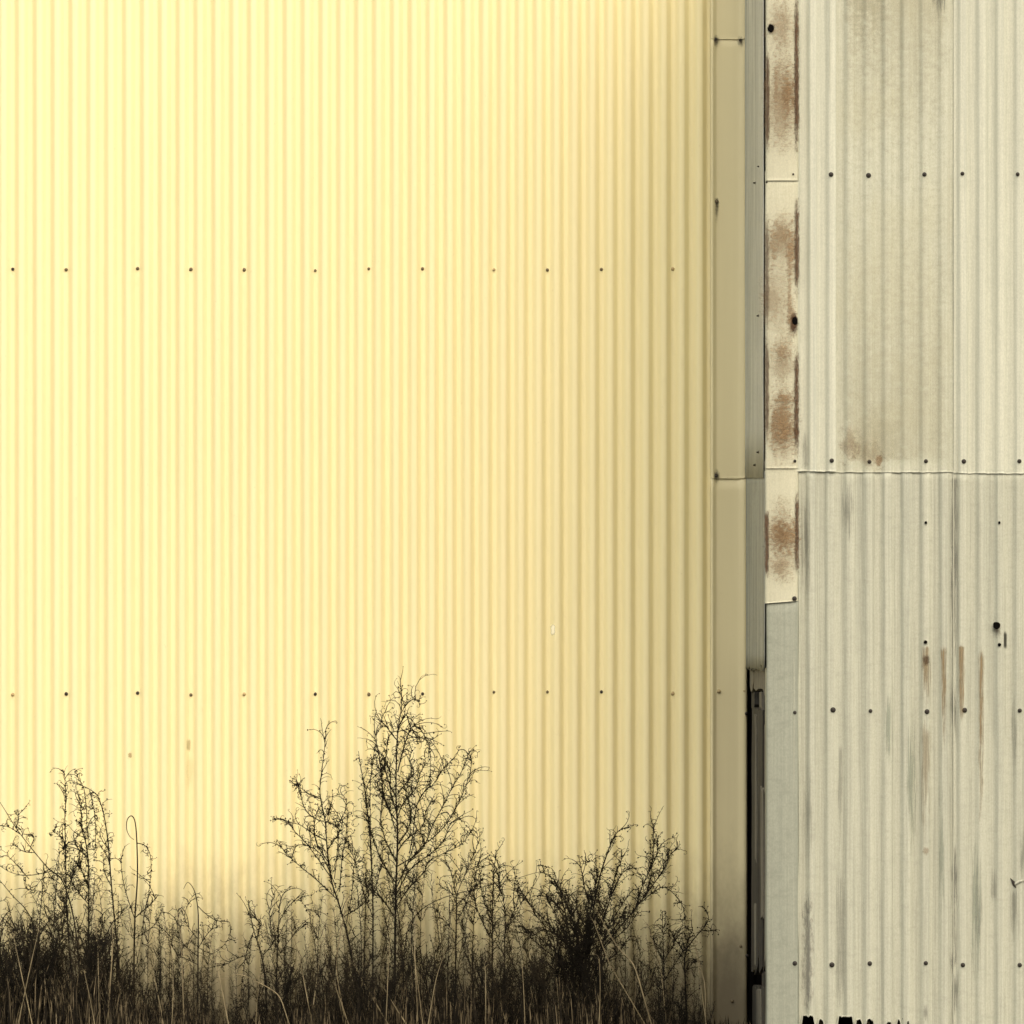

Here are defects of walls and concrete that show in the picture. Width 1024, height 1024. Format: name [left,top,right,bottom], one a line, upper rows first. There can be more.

rust [765,2,799,151]
rust [765,200,800,333]
rust [765,344,799,453]
rust [764,494,801,573]